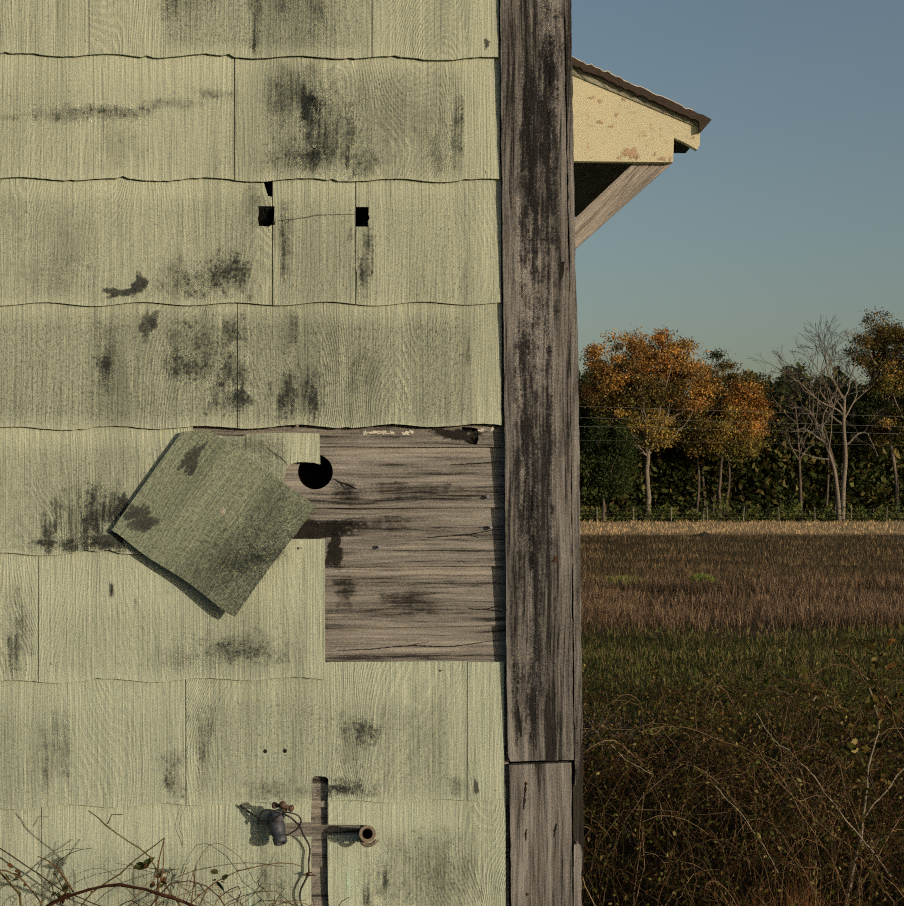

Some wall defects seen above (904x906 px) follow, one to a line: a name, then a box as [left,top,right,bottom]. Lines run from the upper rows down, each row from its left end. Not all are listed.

mould [270,67,377,178]
mould [171,314,254,414]
mould [278,369,326,418]
mould [32,487,160,552]